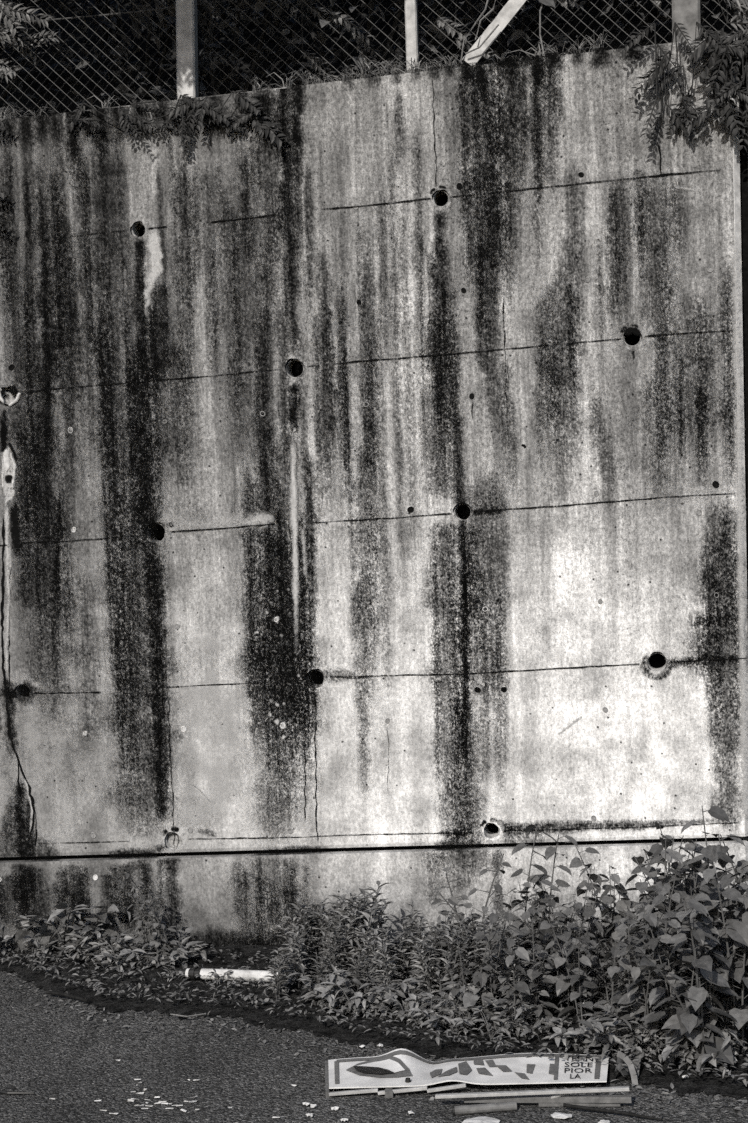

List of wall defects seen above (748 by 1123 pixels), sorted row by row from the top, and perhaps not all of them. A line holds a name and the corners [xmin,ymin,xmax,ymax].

peeling [1,447,16,506]
crack [0,519,37,849]
water stain [0,57,563,930]
water stain [534,171,748,826]